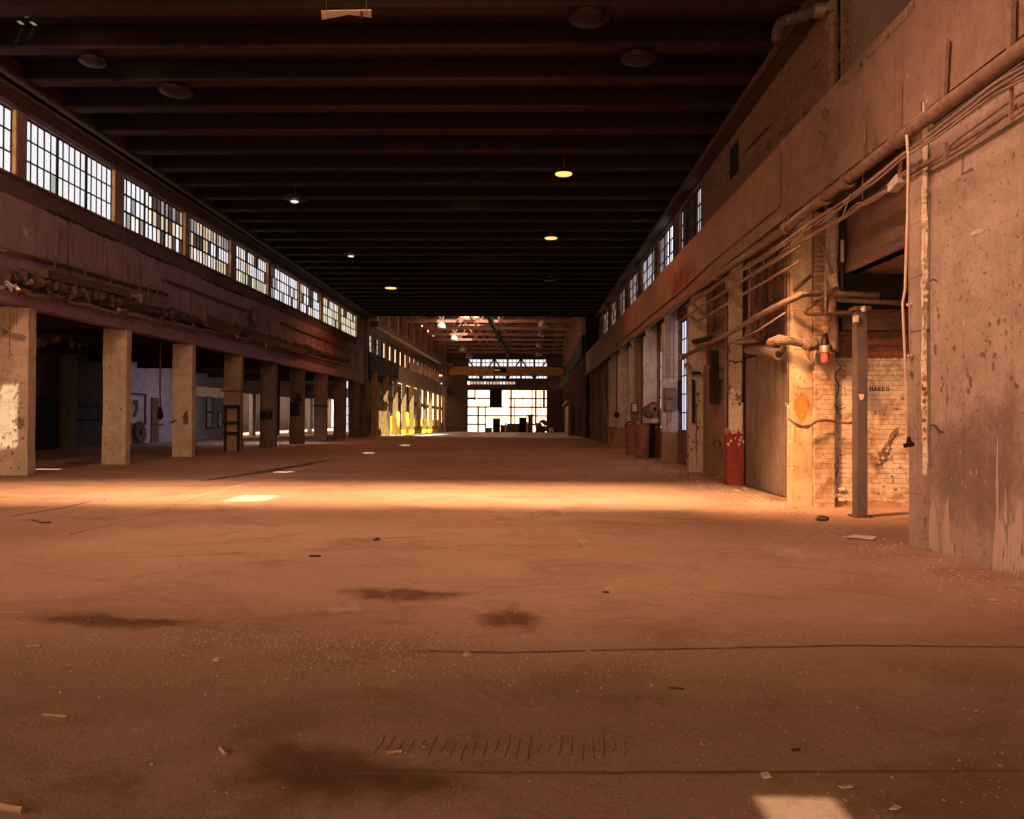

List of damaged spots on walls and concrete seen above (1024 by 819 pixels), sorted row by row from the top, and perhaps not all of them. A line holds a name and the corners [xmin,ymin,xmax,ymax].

peeling [910,127,948,475]
peeling [727,385,744,446]
corrosion [793,394,810,438]
spalling [876,427,902,495]
water stain [929,407,1024,580]